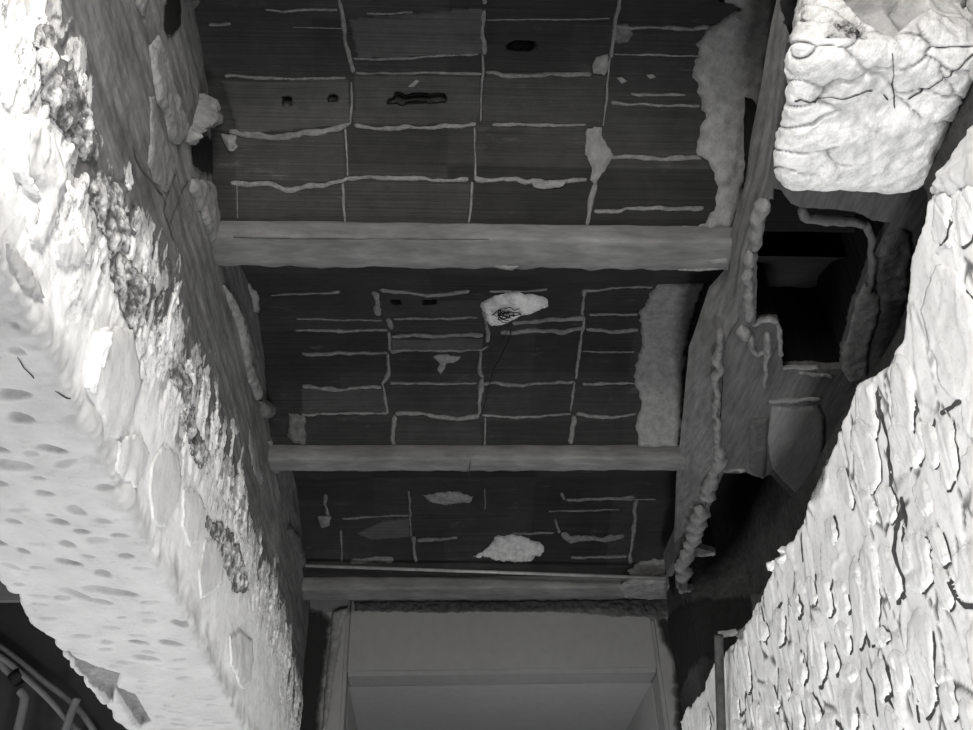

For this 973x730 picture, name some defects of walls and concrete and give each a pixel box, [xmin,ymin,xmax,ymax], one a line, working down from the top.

crack [794,53,973,109]
spalling [5,0,249,599]
crack [932,399,962,428]
peeling [732,185,973,730]
crack [875,387,913,577]
crack [800,532,833,608]
crack [947,579,973,609]
peeling [229,630,254,689]
peeling [702,699,717,730]
crack [866,632,920,723]